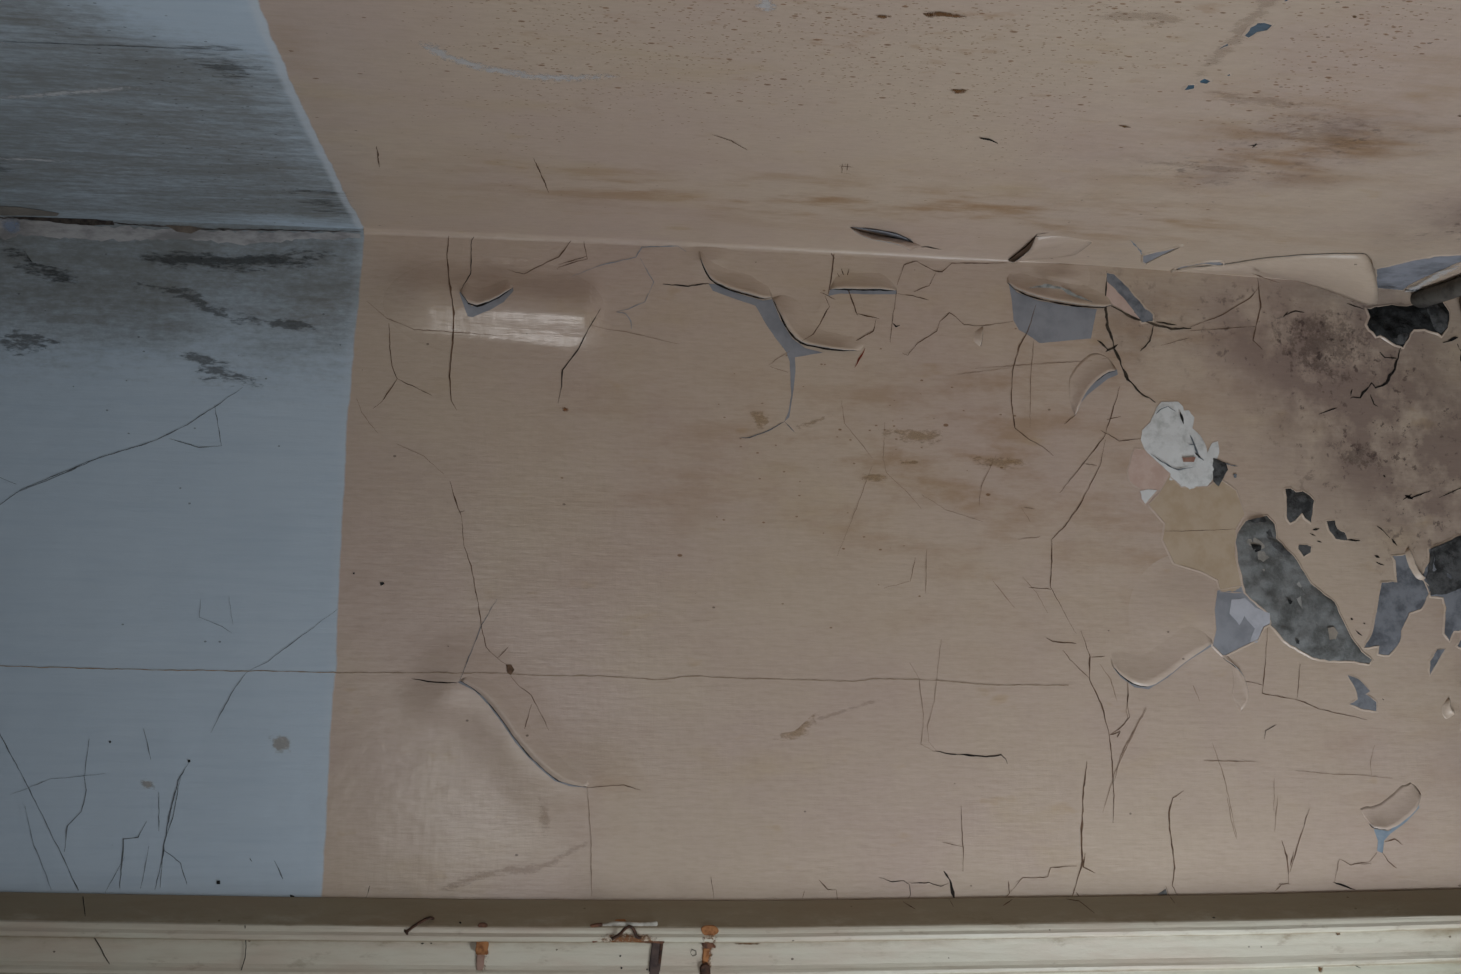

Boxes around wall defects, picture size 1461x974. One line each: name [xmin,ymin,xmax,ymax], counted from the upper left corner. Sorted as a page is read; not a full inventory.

crack [69,218,358,232]
peeling [828,272,897,296]
peeling [850,227,924,250]
peeling [1007,236,1154,415]
peeling [1141,244,1461,349]
crack [1350,348,1401,406]
crack [0,233,1279,913]
spalling [1111,447,1461,713]
crack [1204,629,1392,839]
crack [1274,794,1309,891]
crack [1334,839,1401,890]